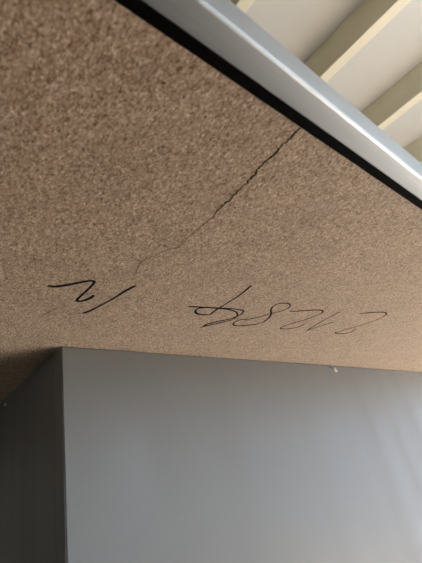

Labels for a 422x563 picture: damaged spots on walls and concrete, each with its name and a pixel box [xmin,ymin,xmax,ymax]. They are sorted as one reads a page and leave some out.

crack [132,128,300,279]